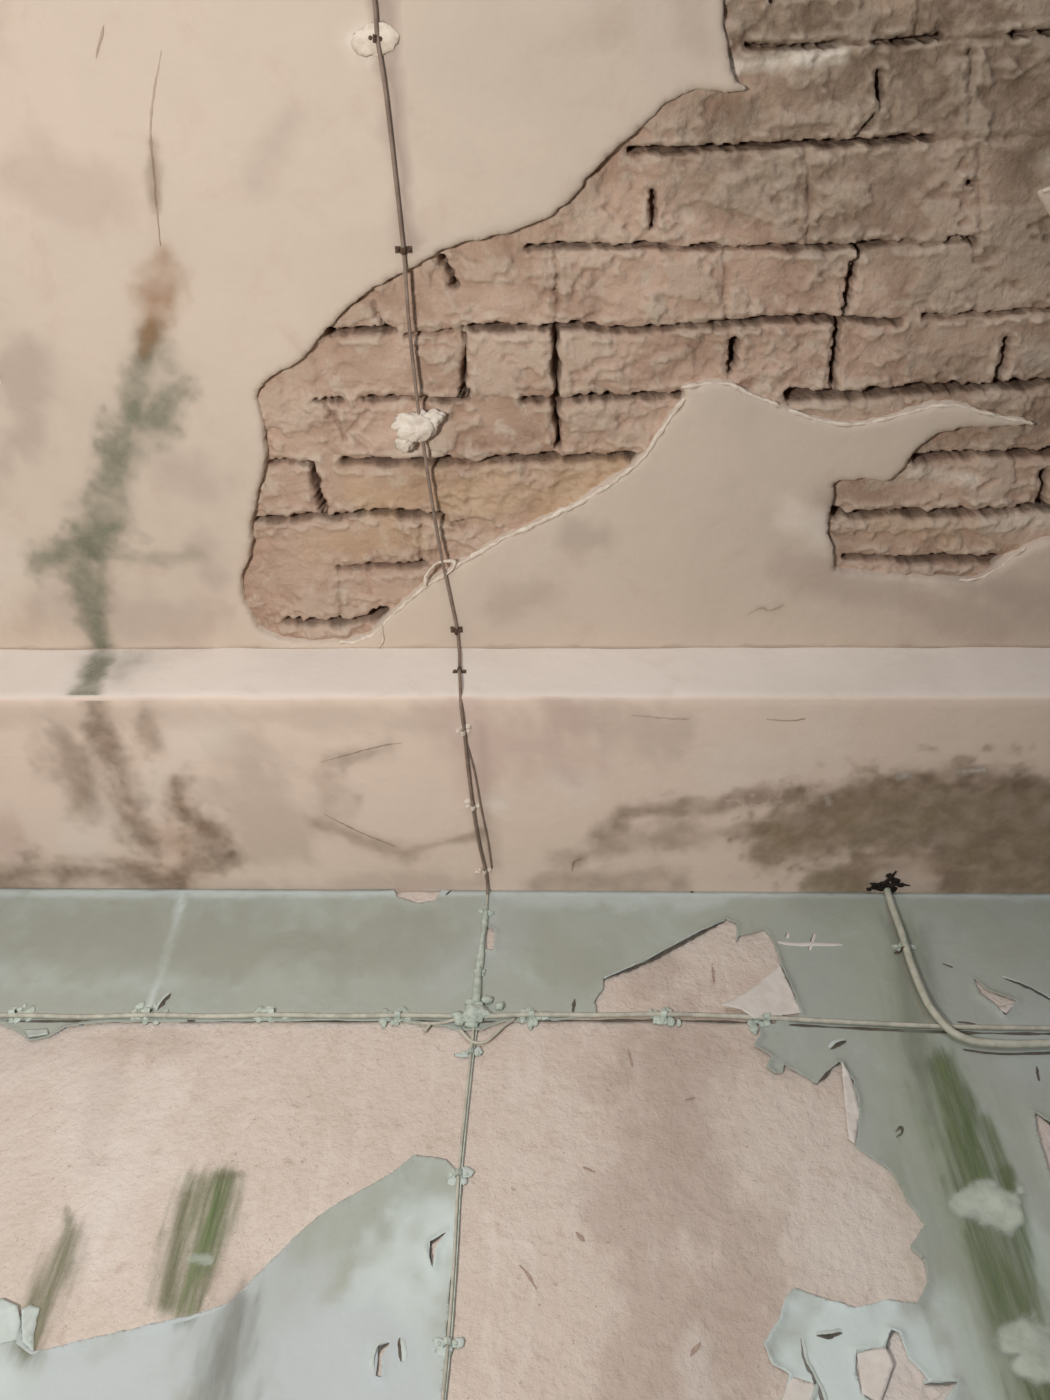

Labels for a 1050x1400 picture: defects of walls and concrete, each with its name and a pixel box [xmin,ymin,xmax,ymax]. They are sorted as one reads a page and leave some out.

water stain [140,322,156,364]
flaking render [243,0,1050,648]
water stain [102,397,171,481]
water stain [47,522,121,695]
water stain [759,775,1050,893]
water stain [163,1172,232,1317]
peeling [0,919,927,1400]
water stain [932,1055,1050,1400]
peeling [1036,1114,1050,1171]
peeling [855,1332,958,1400]